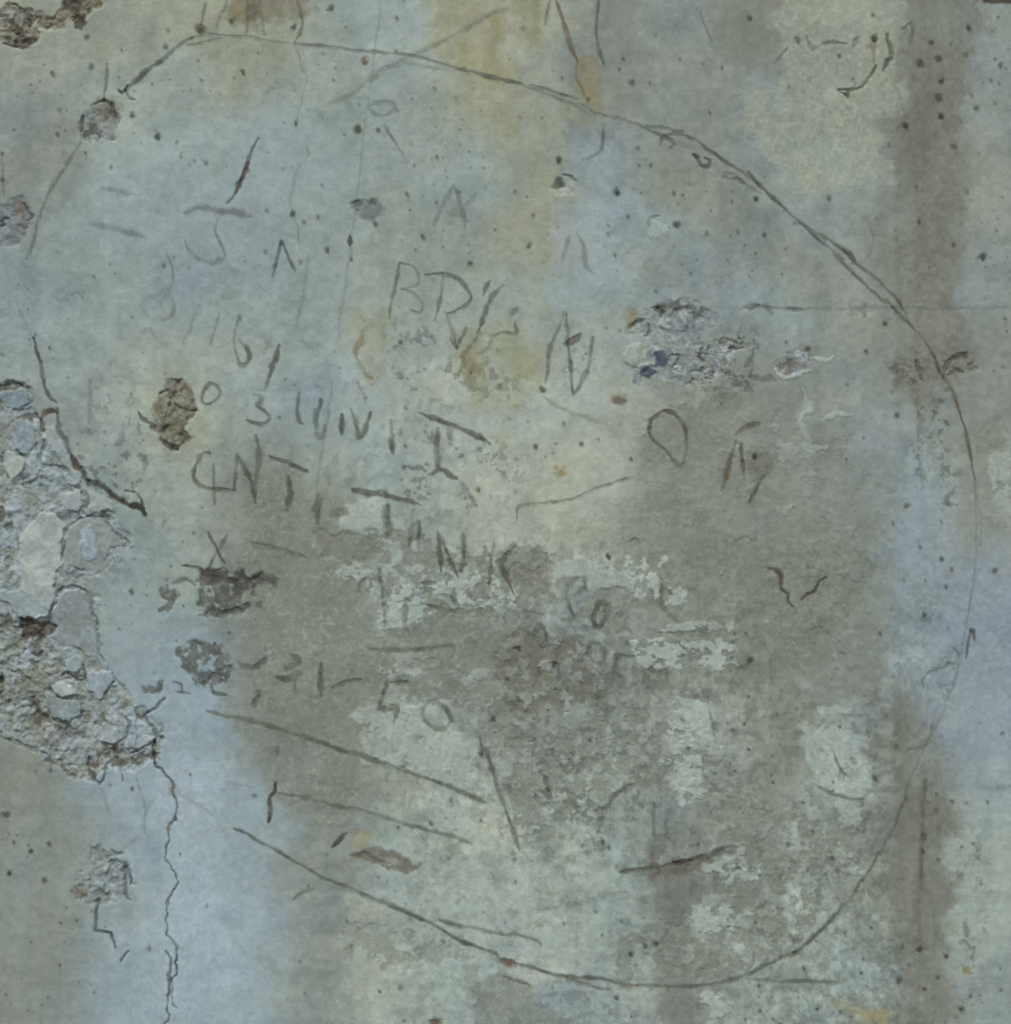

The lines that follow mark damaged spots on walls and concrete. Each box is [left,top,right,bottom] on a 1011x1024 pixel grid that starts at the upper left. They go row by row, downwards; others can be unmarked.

spalling [0,0,102,48]
spalling [0,196,35,246]
spalling [79,101,120,143]
water stain [892,0,981,405]
crack [33,337,147,516]
spalling [625,298,743,386]
spalling [0,379,231,782]
spalling [197,568,277,618]
crack [153,741,179,1022]
water stain [887,703,967,1024]